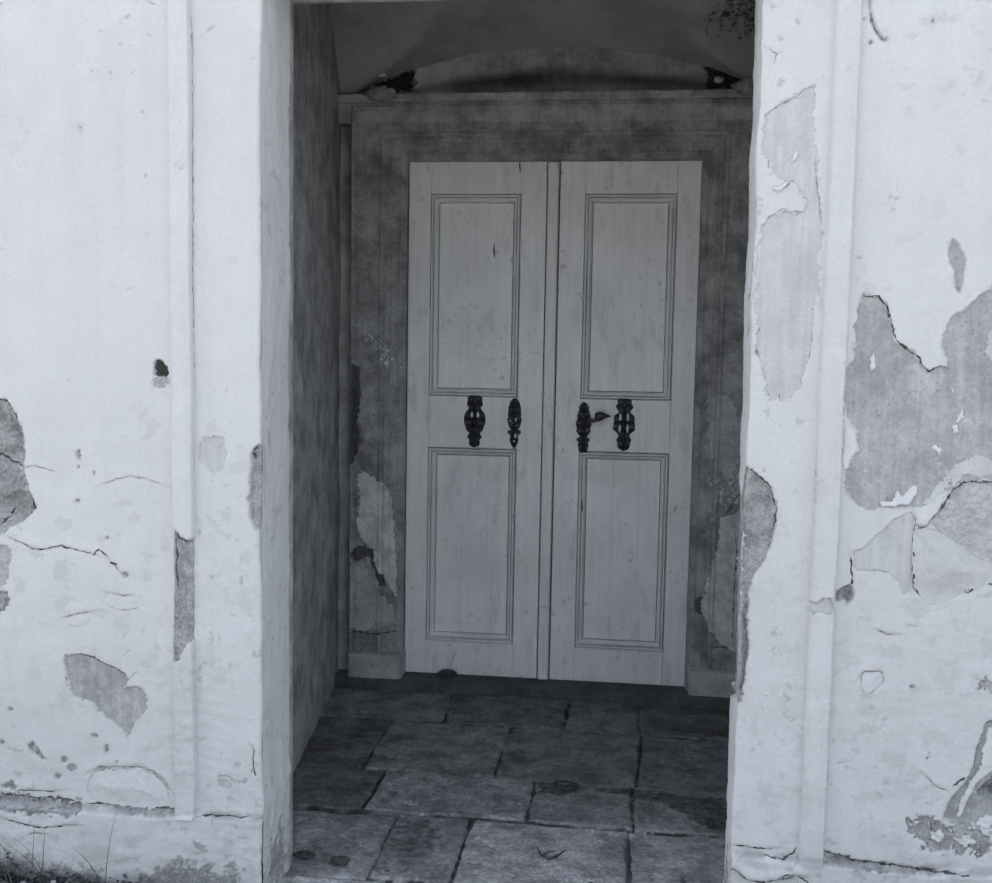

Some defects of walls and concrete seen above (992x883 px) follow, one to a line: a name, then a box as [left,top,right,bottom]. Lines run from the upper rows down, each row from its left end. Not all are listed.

damp [697,0,755,39]
peeling [754,85,824,402]
spalling [155,359,169,377]
peeling [842,287,992,509]
flaking render [0,399,35,611]
crack [9,537,137,626]
spalling [174,532,195,660]
peeling [349,359,399,631]
spalling [695,393,777,700]
peeling [65,653,147,734]
peeling [906,721,992,857]
crack [732,845,809,883]